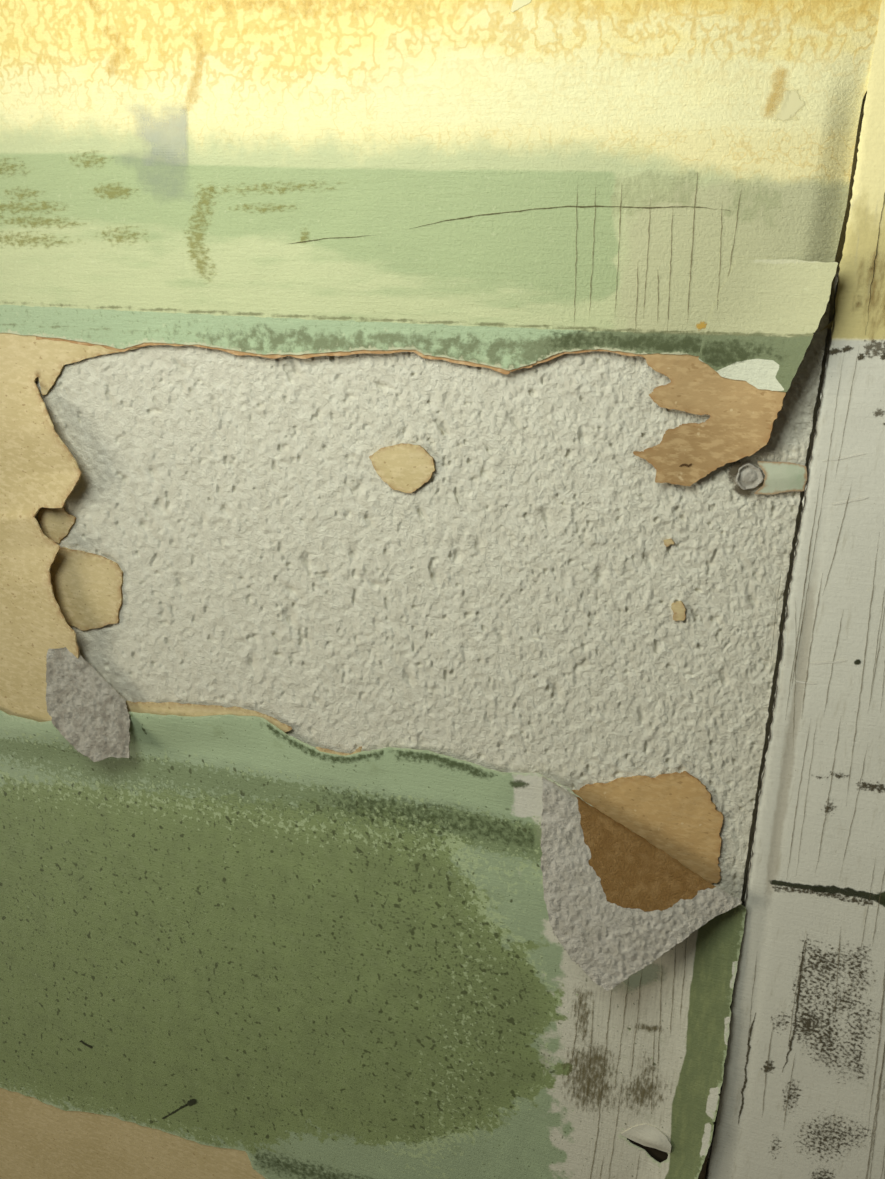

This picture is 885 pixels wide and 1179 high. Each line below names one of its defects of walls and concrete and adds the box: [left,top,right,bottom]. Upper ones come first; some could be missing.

leakage [0,192,78,246]
leakage [188,187,214,273]
crack [290,235,370,244]
crack [410,205,730,229]
leakage [826,340,885,360]
crack [744,274,839,907]
peeling [0,345,801,1179]
leakage [738,1013,756,1124]
leakage [761,939,878,1112]
crack [706,1086,722,1179]
leakage [797,1115,871,1179]